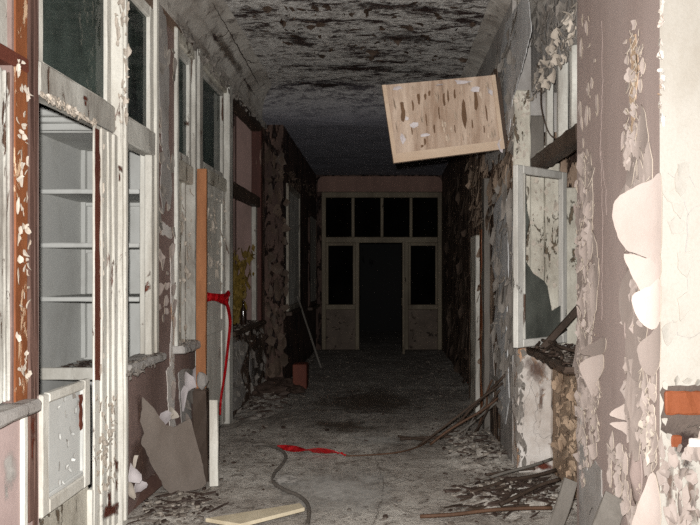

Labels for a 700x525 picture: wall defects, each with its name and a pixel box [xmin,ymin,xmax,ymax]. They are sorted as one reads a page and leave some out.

damp [213,34,242,70]
damp [279,37,316,47]
peeling [279,5,331,46]
damp [316,2,433,11]
damp [329,65,422,73]
peeling [314,2,440,63]
damp [378,34,447,42]
peeling [159,3,197,427]
flaking render [455,0,590,467]
peeling [233,145,291,413]
peeling [551,20,700,525]
peeling [128,455,148,500]